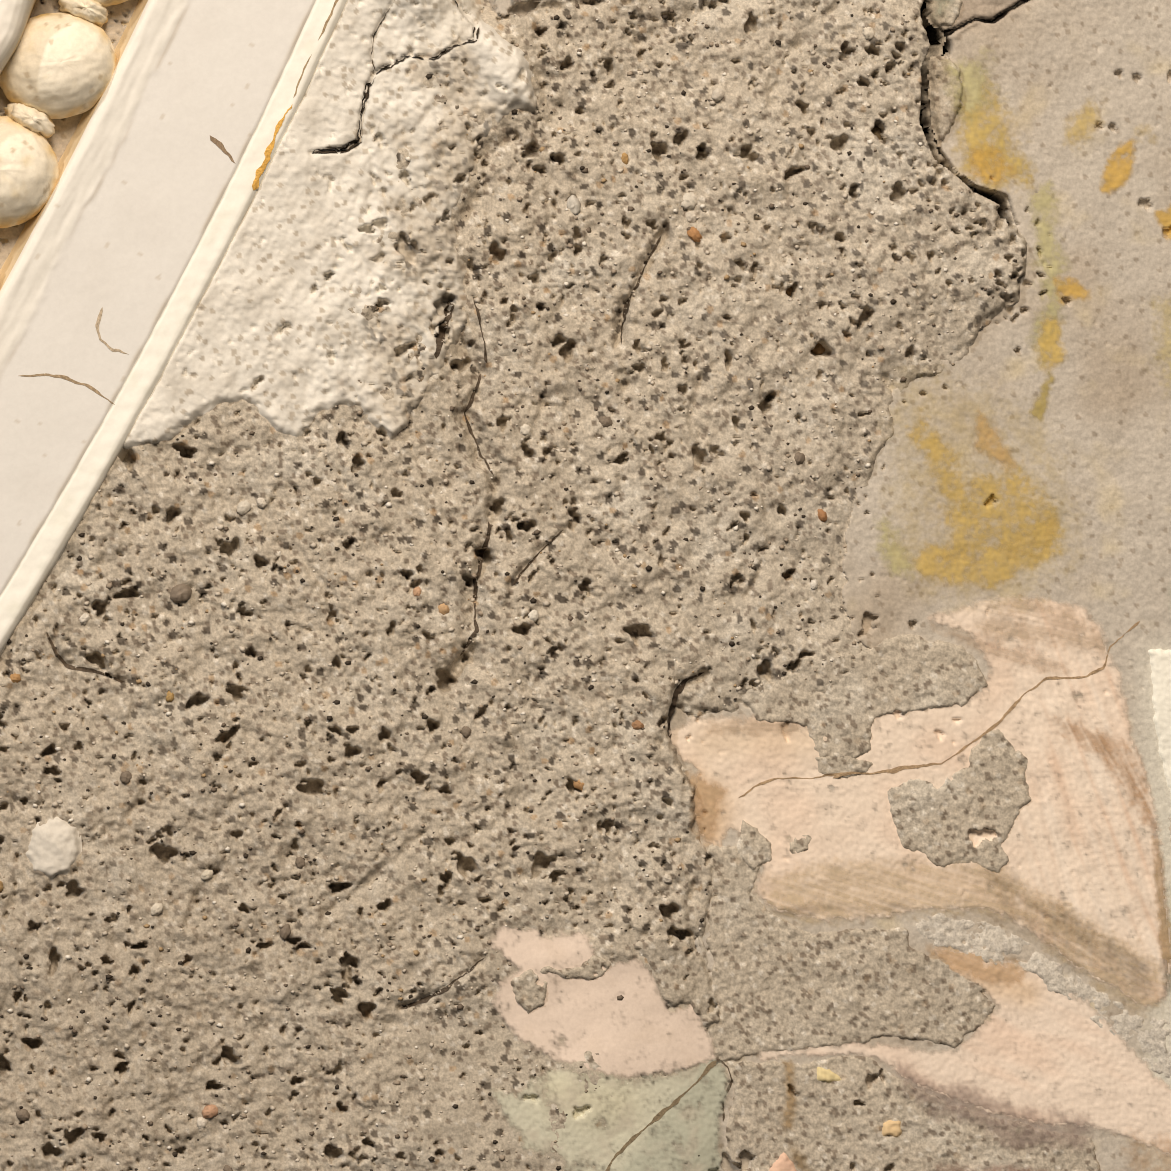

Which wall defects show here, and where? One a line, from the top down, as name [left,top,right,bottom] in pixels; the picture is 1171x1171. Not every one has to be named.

crack [293,0,338,98]
flaking render [123,0,538,450]
crack [313,1,479,154]
spalling [927,52,963,147]
crack [920,87,1009,223]
crack [920,0,1028,56]
crack [740,621,1140,797]
peeling [670,597,1171,1006]
peeling [492,926,720,1085]
spalling [706,844,1171,1155]
crack [606,1058,733,1171]
spalling [494,1055,1100,1171]